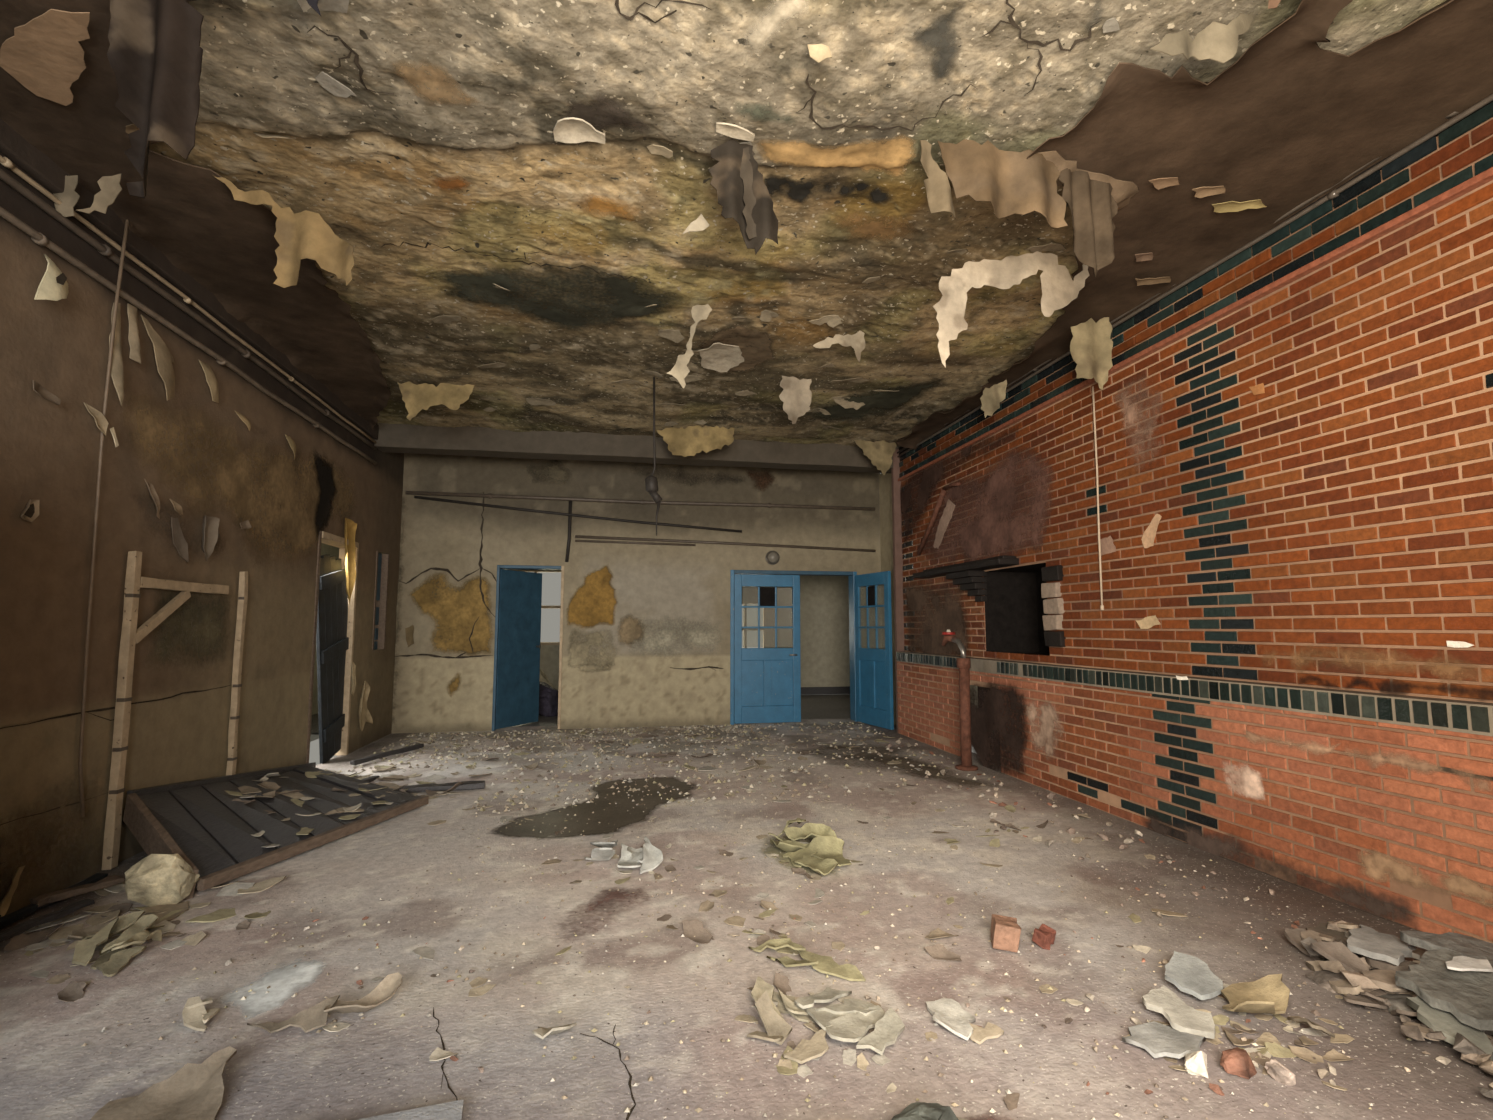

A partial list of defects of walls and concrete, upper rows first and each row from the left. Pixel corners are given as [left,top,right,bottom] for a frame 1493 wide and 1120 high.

crack [615,0,711,23]
peeling [807,44,832,63]
peeling [0,0,475,430]
flaking render [553,96,673,159]
peeling [683,105,789,255]
peeling [854,0,1493,475]
damp [438,264,676,328]
flaking render [644,304,779,457]
peeling [779,315,893,424]
crack [395,492,497,658]
damp [493,777,696,839]
crack [580,1024,636,1120]